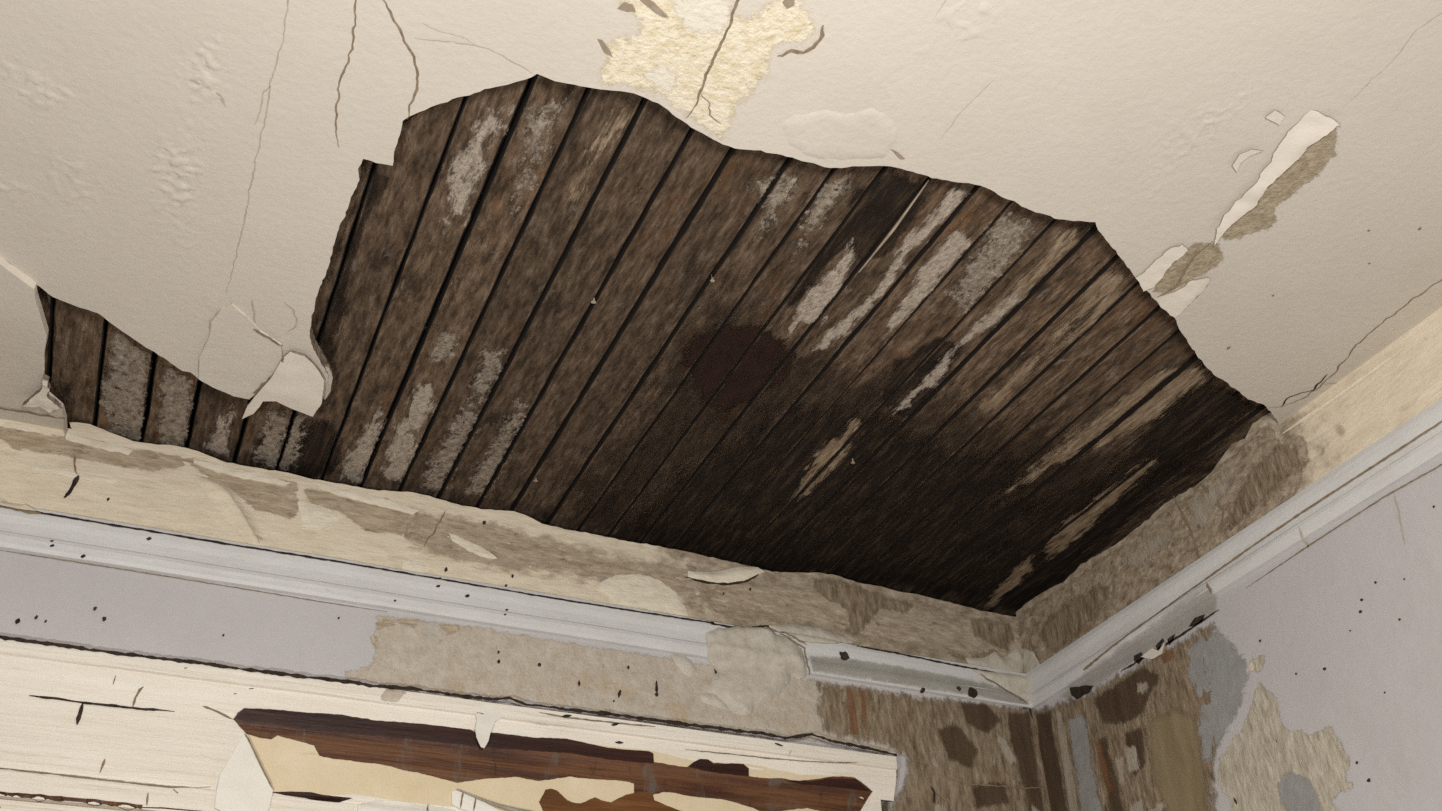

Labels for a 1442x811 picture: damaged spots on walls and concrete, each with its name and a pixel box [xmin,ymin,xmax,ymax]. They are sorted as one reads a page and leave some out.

crack [188,0,289,295]
crack [335,0,531,147]
peeling [617,0,669,18]
crack [686,0,739,124]
peeling [778,25,825,57]
flaking render [1135,110,1340,318]
flaking render [198,301,333,419]
water stain [249,349,529,497]
water stain [625,172,1253,659]
flaking render [0,349,1403,811]